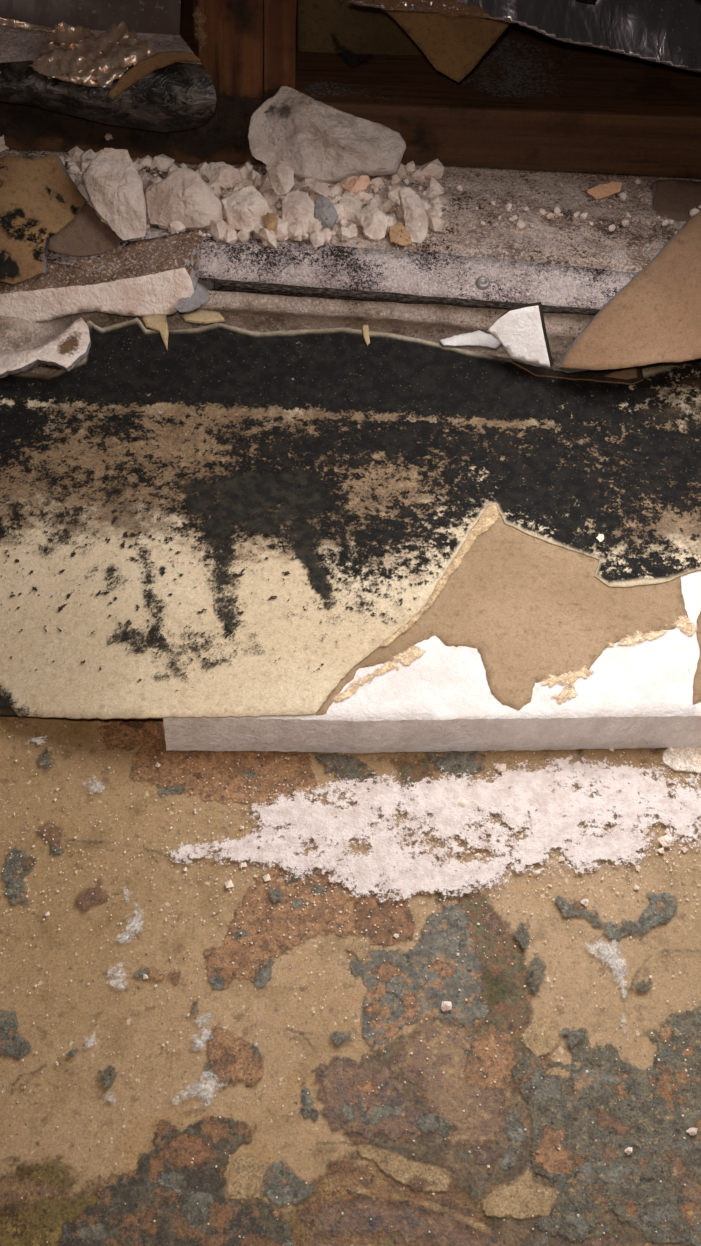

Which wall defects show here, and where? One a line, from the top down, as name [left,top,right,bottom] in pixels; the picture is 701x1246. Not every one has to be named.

water stain [0,322,701,691]
water stain [0,685,38,719]
peeling [426,751,485,776]
water stain [435,883,548,1093]
water stain [0,1173,124,1212]